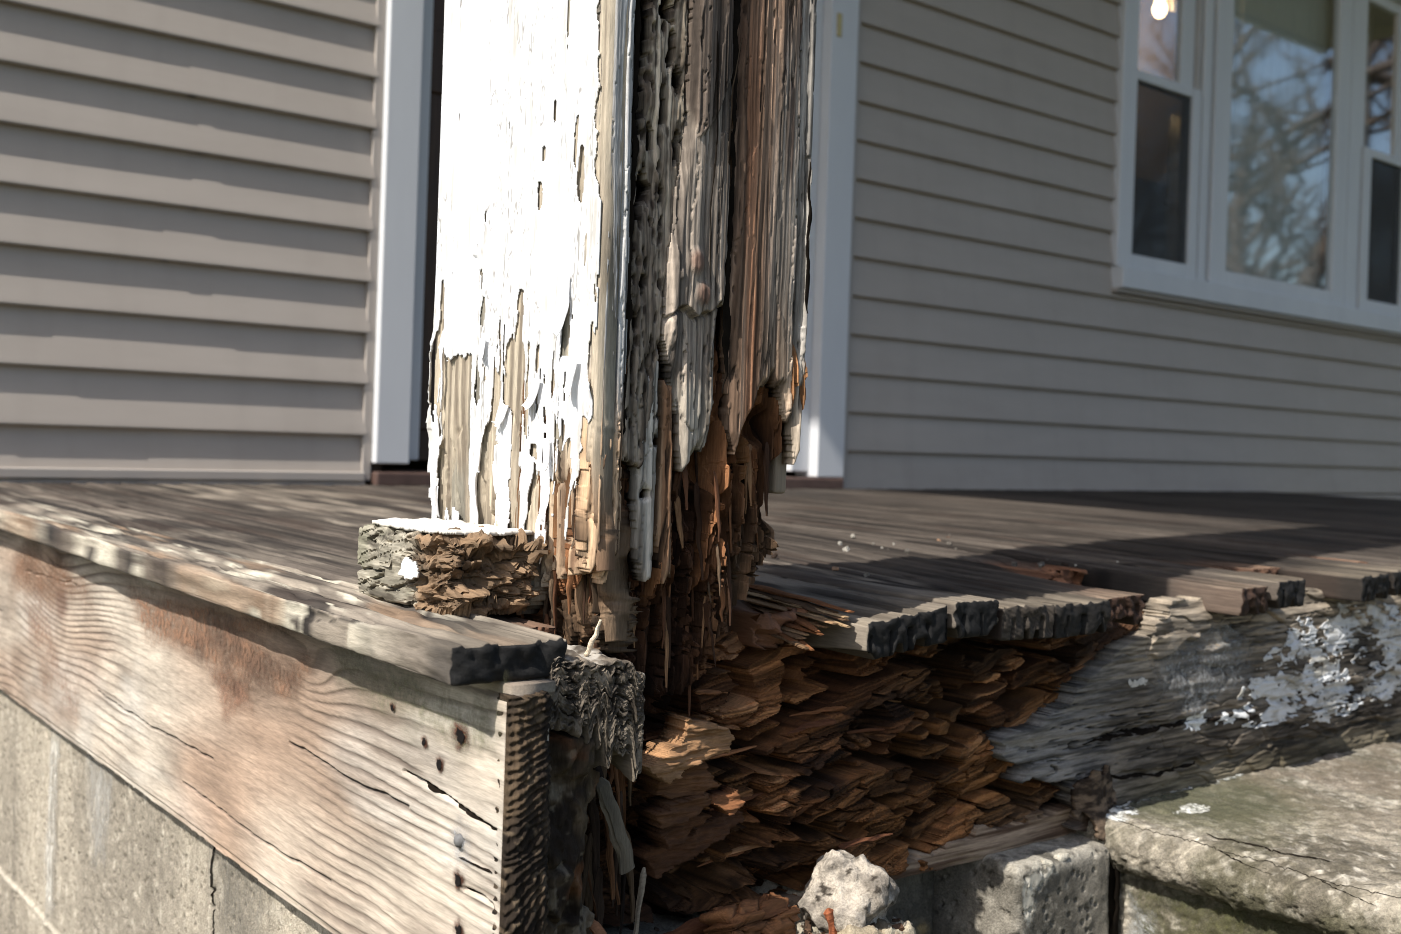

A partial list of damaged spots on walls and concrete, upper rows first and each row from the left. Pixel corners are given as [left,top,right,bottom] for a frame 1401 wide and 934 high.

peeling [372,0,602,564]
peeling [398,557,420,580]
peeling [1128,677,1148,688]
peeling [1161,602,1401,731]
crack [209,847,217,934]
spalling [837,918,910,934]